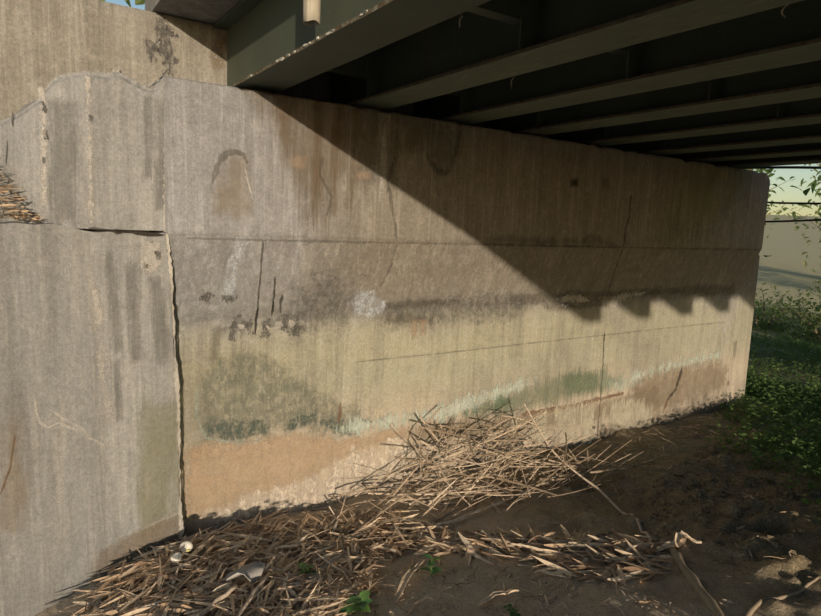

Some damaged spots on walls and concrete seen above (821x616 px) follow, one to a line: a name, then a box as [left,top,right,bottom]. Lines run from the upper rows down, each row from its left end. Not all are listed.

water stain [224,239,249,295]
crack [255,242,264,334]
water stain [351,291,386,317]
crack [597,332,605,429]
water stain [529,349,721,449]
crack [665,369,682,408]